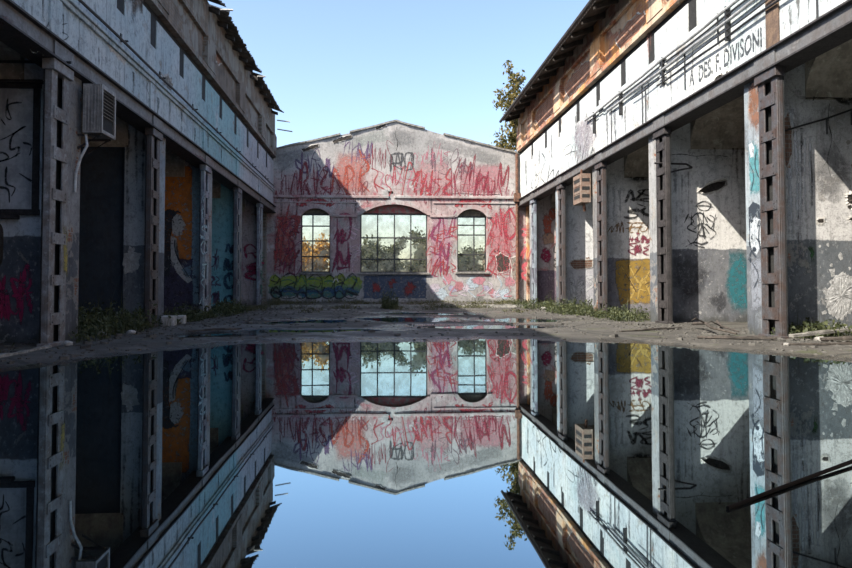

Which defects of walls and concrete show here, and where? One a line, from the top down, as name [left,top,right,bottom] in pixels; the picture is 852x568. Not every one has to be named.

spalling [696,178,728,195]
spalling [844,190,852,223]
peeling [122,246,142,274]
peeling [494,249,523,285]
peeling [815,252,852,328]